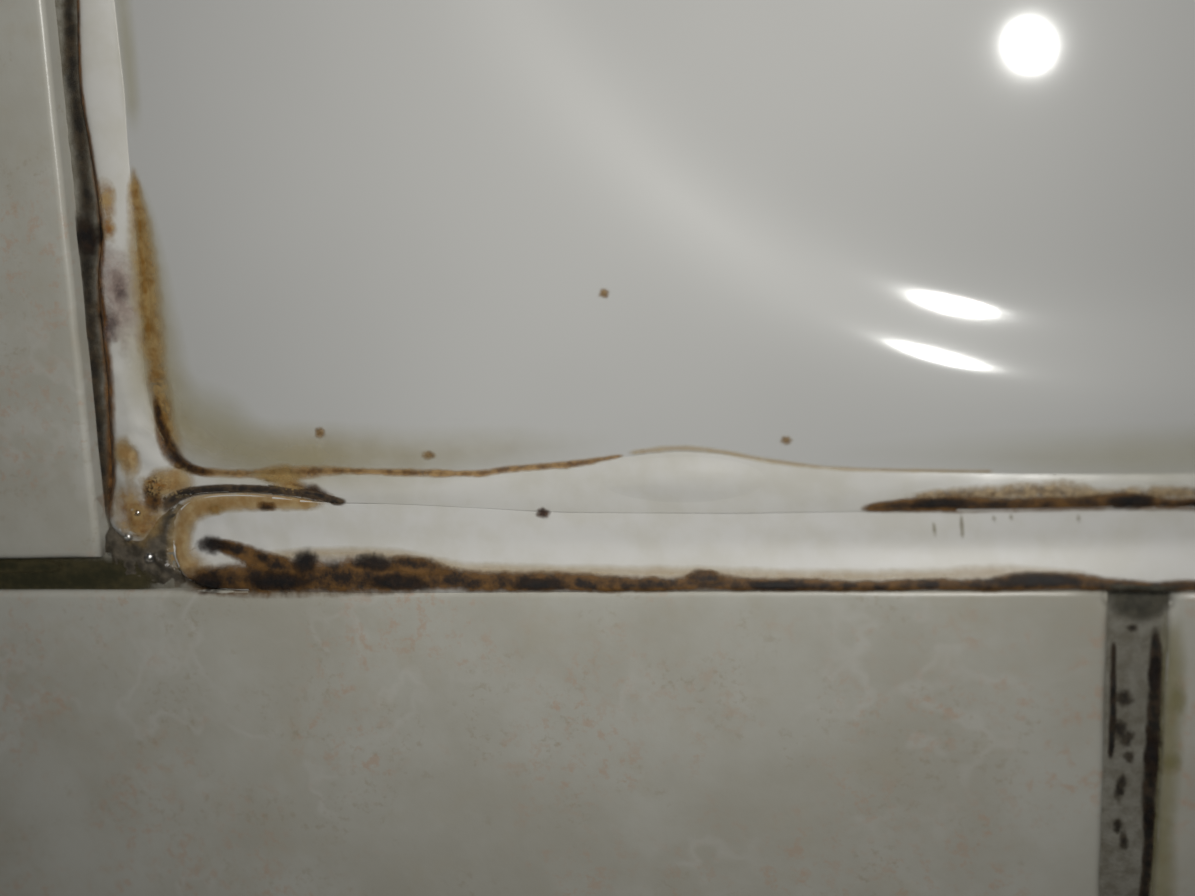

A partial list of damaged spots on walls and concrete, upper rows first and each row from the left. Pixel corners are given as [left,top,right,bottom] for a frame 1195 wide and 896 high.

water stain [64,0,132,518]
water stain [185,537,1195,596]
water stain [864,493,1195,512]
water stain [1108,634,1173,896]